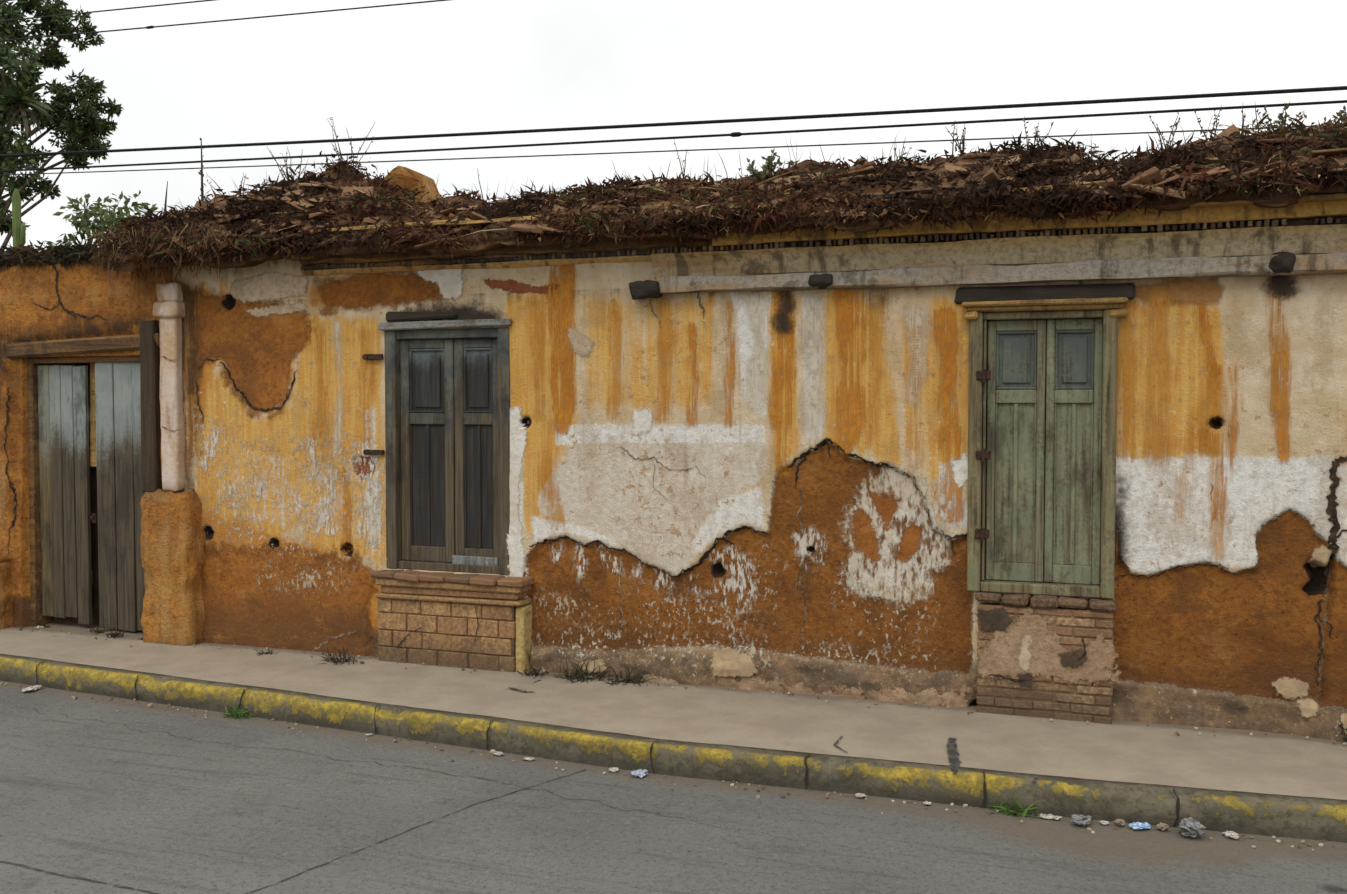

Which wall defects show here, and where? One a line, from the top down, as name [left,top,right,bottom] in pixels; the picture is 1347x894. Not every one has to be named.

crack [34,267,108,320]
spalling [189,264,464,418]
spalling [481,278,559,294]
damp [747,291,824,441]
damp [1135,279,1223,306]
damp [1268,276,1297,298]
spalling [192,406,386,656]
crack [529,526,768,634]
crack [621,447,706,500]
crack [788,438,967,650]
spalling [506,406,1347,734]
crack [1326,456,1347,559]